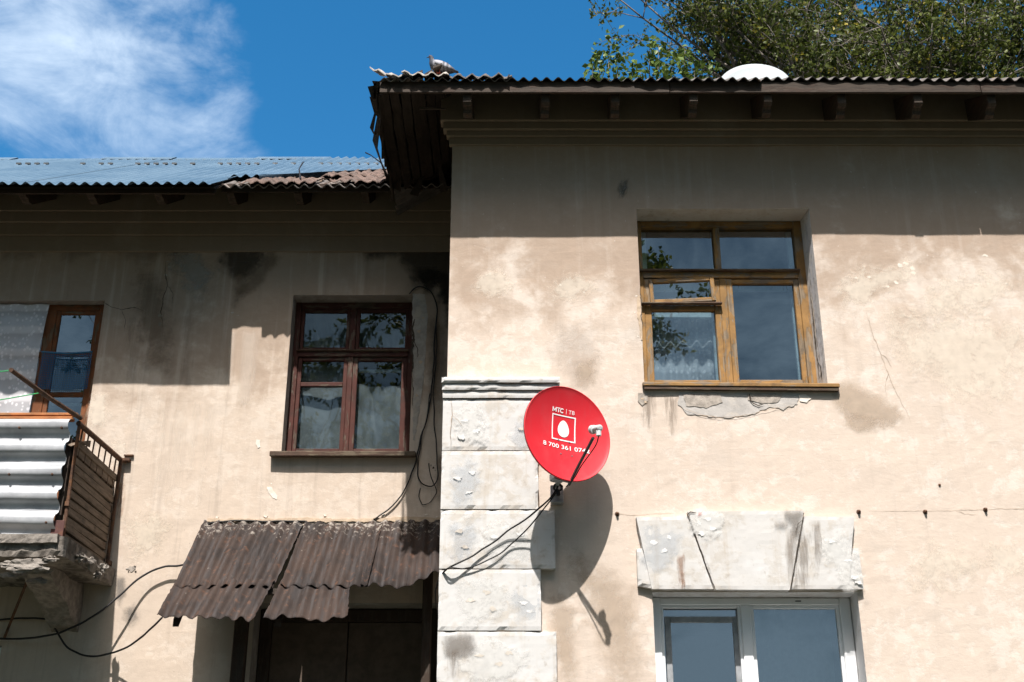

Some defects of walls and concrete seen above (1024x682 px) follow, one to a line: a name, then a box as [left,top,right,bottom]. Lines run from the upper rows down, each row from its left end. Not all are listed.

water stain [226,252,260,276]
spalling [677,392,811,418]
water stain [839,386,898,428]
water stain [780,511,801,533]
spalling [0,555,59,585]
spalling [74,551,109,580]
crack [790,513,804,591]